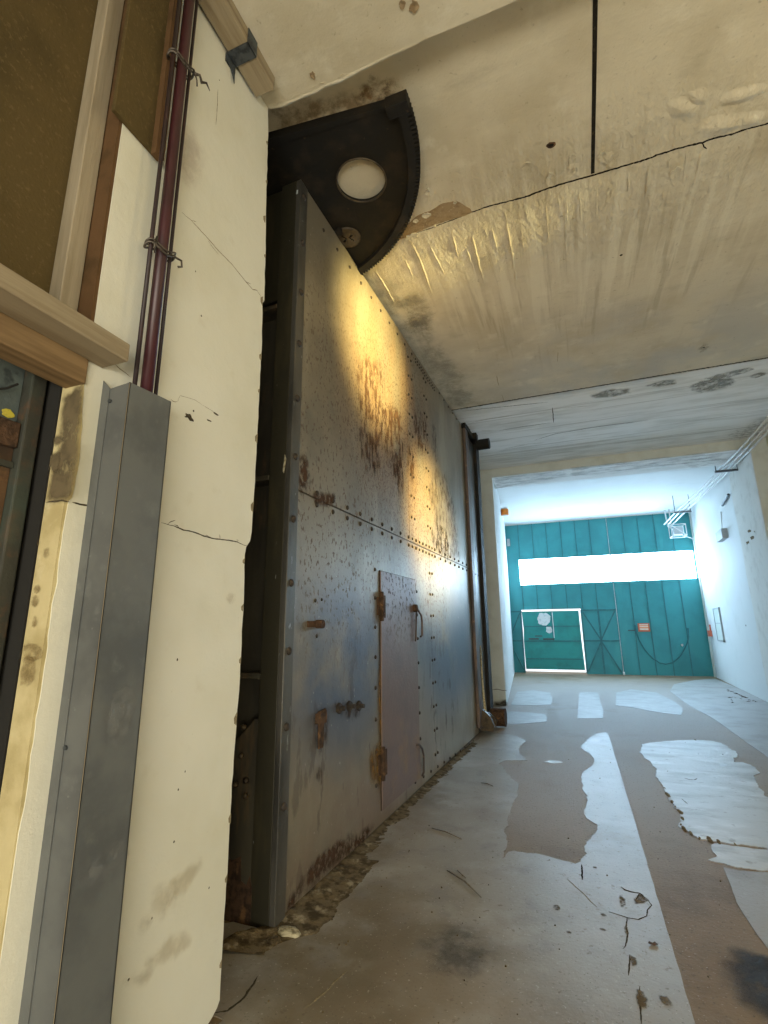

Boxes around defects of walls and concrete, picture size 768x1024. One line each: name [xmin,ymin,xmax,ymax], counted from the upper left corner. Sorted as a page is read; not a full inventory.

crack [417,122,768,233]
peeling [399,201,528,295]
rust [357,361,436,490]
leakage [592,389,628,398]
leakage [692,368,765,390]
crack [164,520,246,546]
rust [299,457,335,506]
rust [429,471,459,558]
rust [287,827,370,911]
peeling [213,690,695,1024]
peeling [639,739,768,948]
crack [567,864,652,1024]